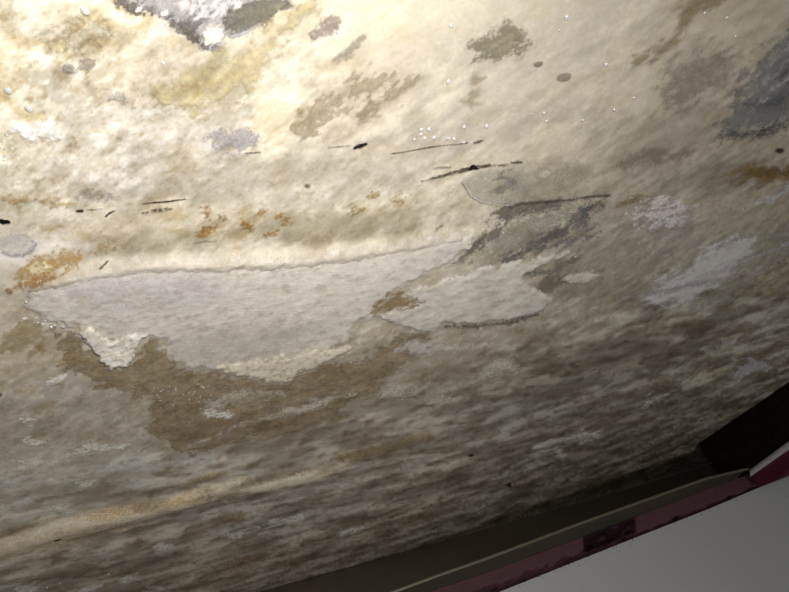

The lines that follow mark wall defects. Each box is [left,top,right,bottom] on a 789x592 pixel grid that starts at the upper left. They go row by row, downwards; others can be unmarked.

leakage [309,15,341,40]
leakage [114,0,317,120]
leakage [290,71,419,139]
crack [392,140,483,154]
crack [422,161,522,181]
corrosion [721,162,789,189]
efflorescence [624,195,698,234]
corrosion [6,245,82,293]
peeling [562,270,600,284]
peeling [24,231,571,460]
efflorescence [680,337,772,390]
efflorescence [491,428,603,480]